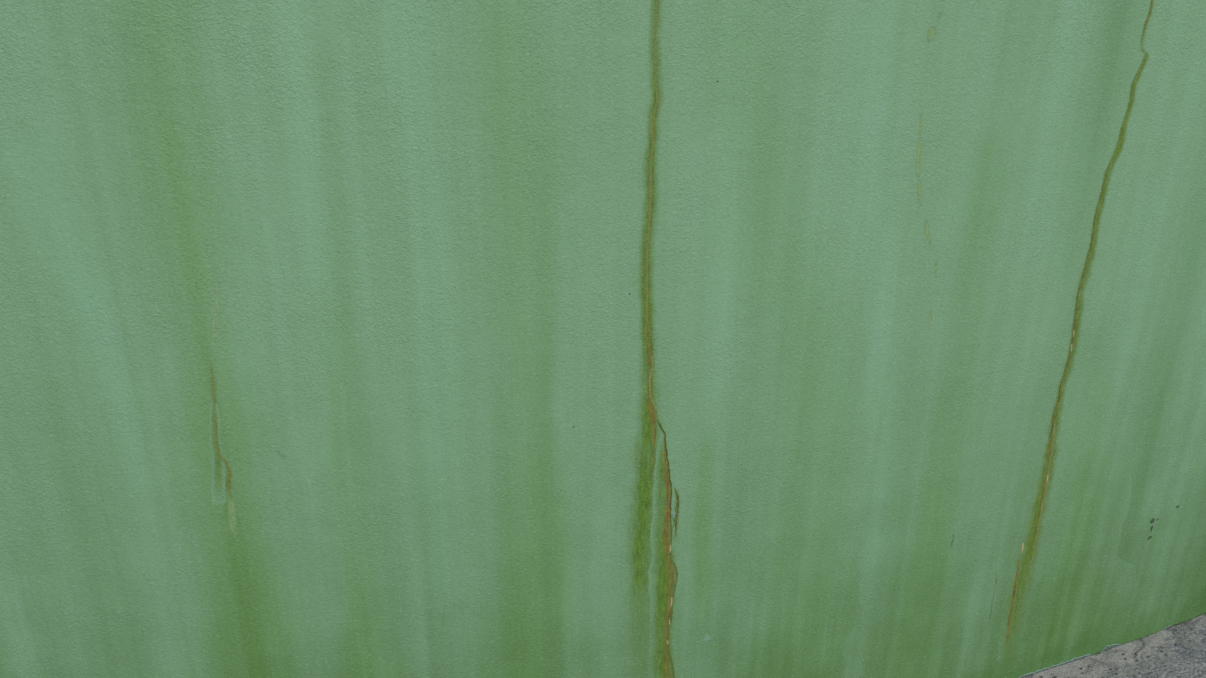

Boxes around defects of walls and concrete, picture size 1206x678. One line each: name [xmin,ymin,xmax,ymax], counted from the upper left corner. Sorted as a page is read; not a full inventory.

crack [209,275,237,535]
water stain [83,0,424,678]
water stain [436,0,613,678]
crack [618,0,696,678]
water stain [671,0,1206,678]
crack [989,0,1161,677]